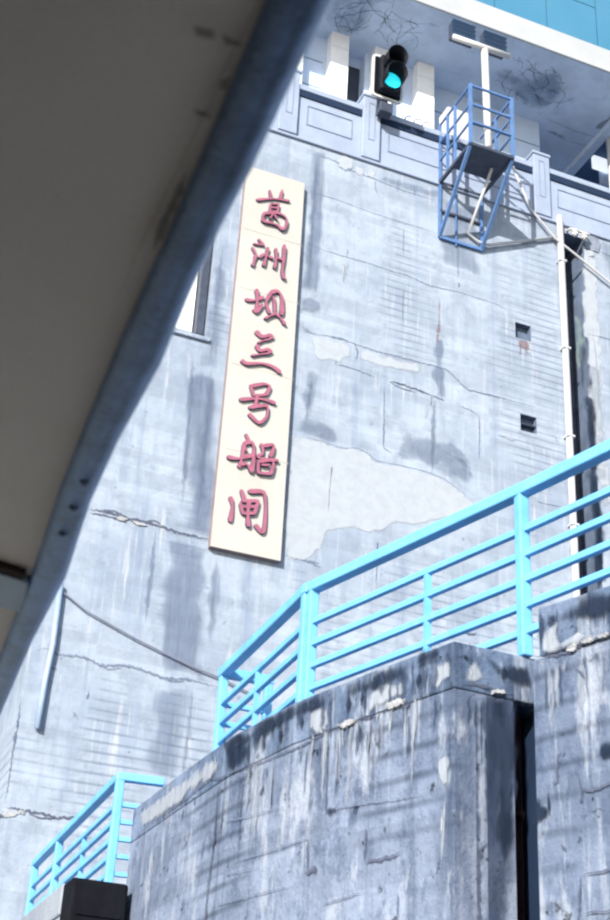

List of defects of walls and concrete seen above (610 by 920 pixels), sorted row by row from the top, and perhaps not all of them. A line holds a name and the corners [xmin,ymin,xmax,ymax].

crack [308,331,514,454]
crack [89,509,208,539]
leakage [539,594,610,652]
crack [51,652,208,685]
leakage [468,664,481,680]
leakage [493,663,530,685]
leakage [545,667,562,718]
crack [2,702,75,820]
leakage [141,649,450,833]
leakage [600,743,610,759]
leakage [468,699,516,920]